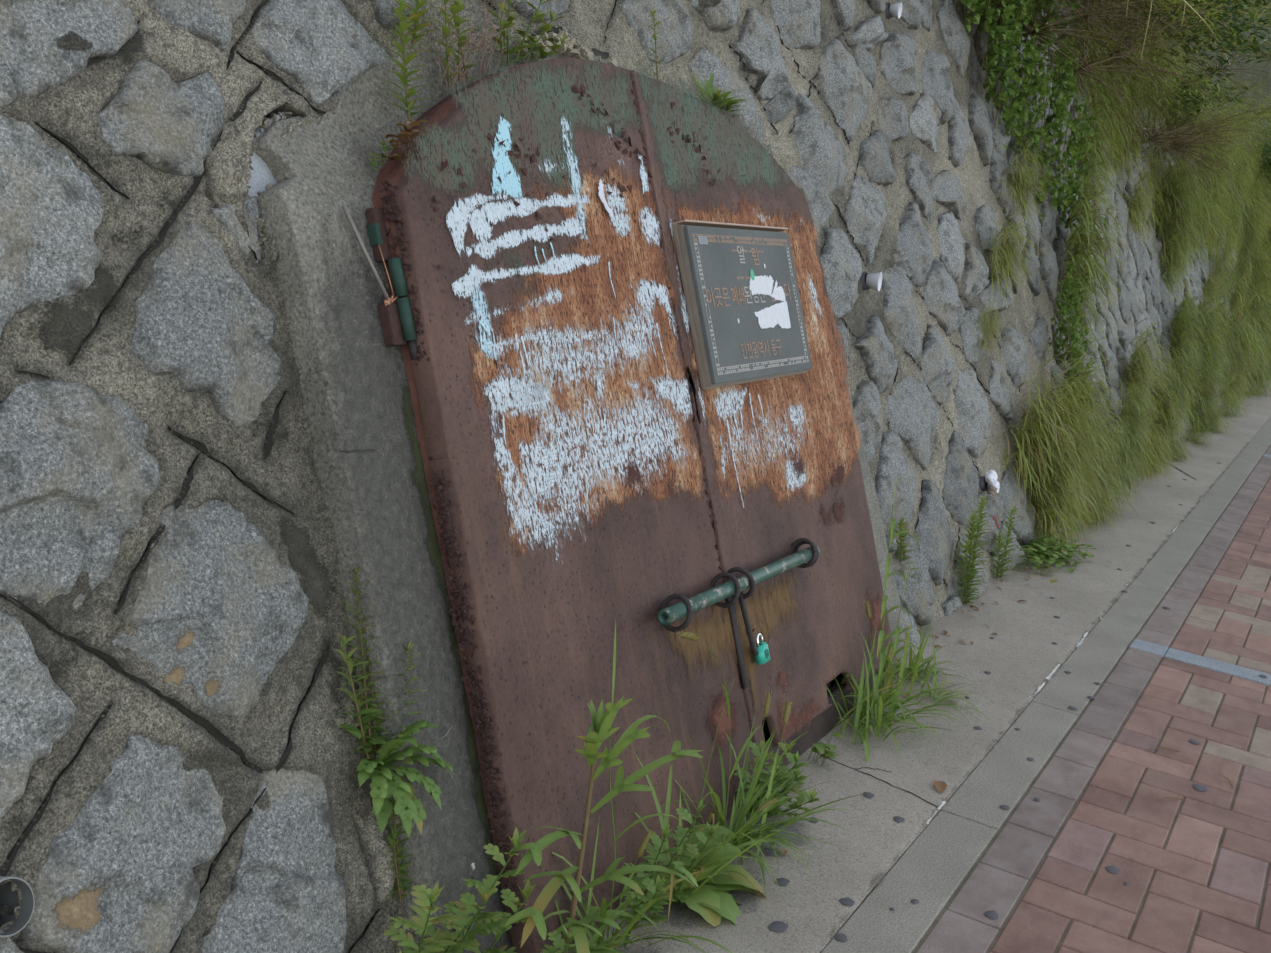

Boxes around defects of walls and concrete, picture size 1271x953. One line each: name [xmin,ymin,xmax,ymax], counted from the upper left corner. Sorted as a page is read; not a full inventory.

peeling [404,55,792,258]
corrosion [379,179,430,365]
corrosion [470,72,861,578]
corrosion [428,469,526,929]
corrosion [668,579,797,709]
crack [816,752,938,807]